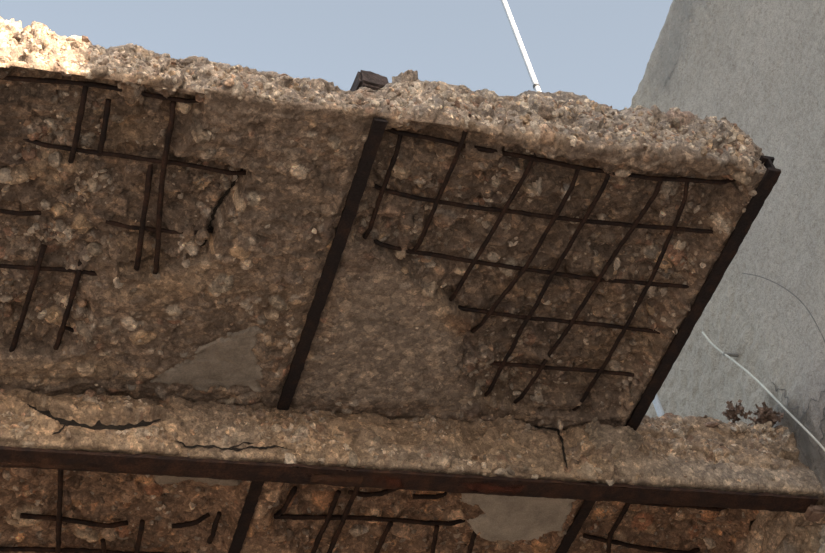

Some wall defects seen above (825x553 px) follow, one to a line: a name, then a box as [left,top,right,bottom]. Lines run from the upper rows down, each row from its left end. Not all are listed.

spalling [0,65,255,363]
crack [200,168,243,247]
spalling [347,119,758,423]
crack [26,403,163,435]
crack [172,440,293,451]
crack [531,425,568,469]
spalling [0,467,251,553]
spalling [267,482,825,553]